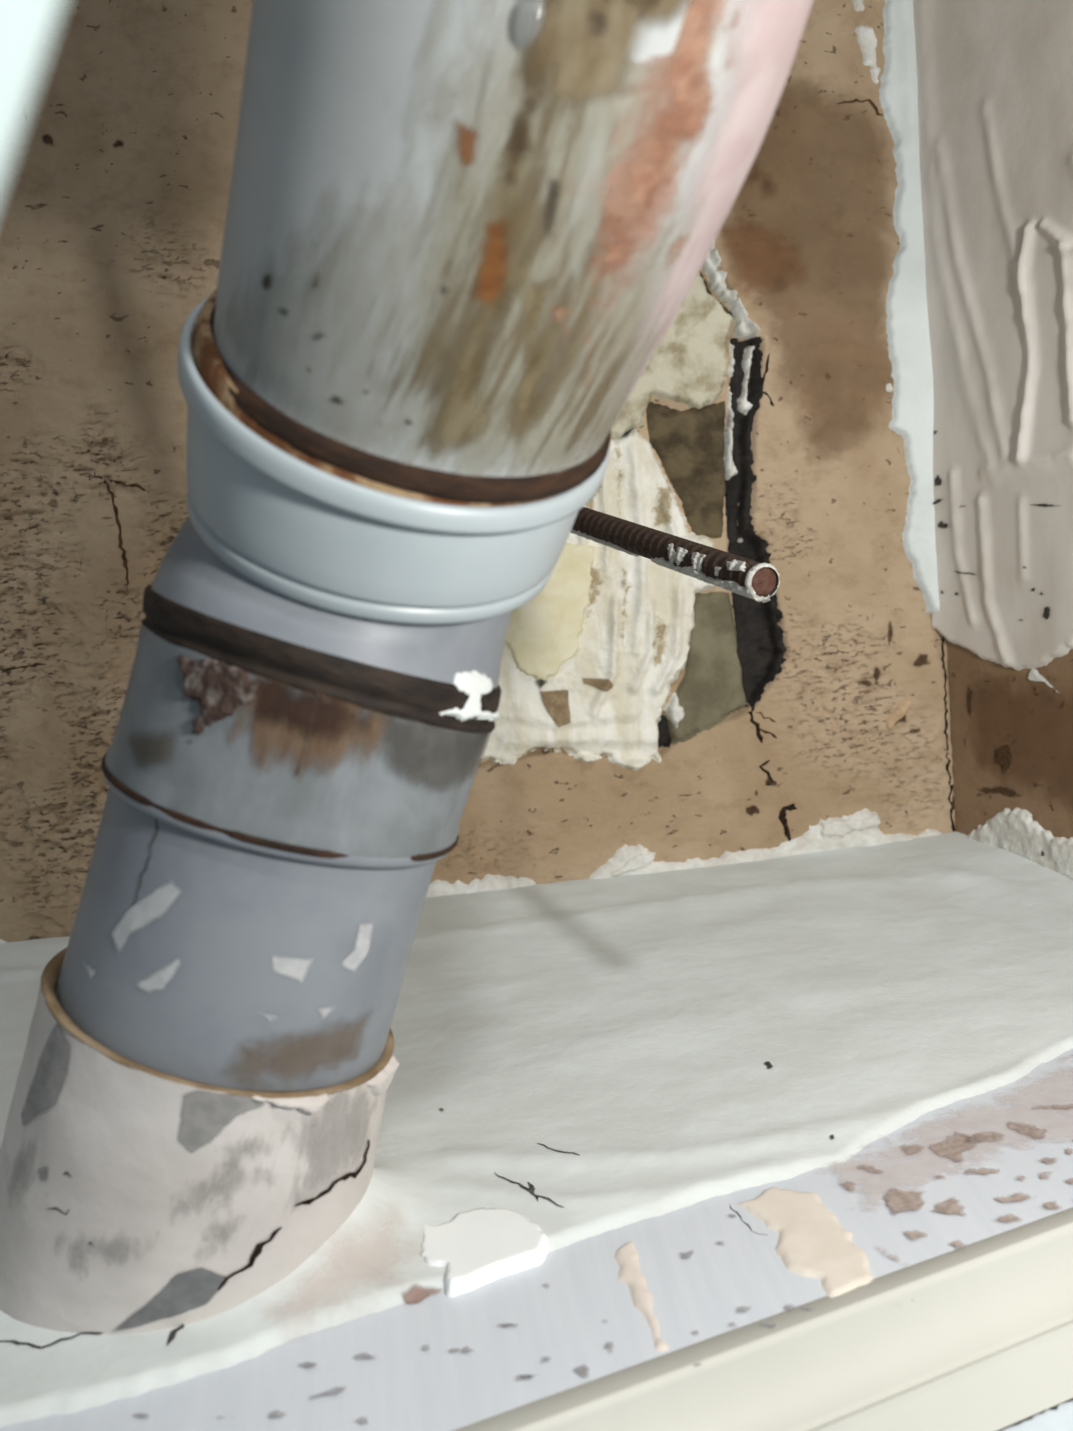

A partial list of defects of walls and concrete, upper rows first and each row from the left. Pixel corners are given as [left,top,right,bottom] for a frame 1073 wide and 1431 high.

flaking render [852,0,881,84]
rust [459,125,476,163]
rust [595,1,711,274]
spalling [584,241,771,564]
spalling [481,533,787,771]
rust [177,654,386,769]
crack [744,705,798,841]
crack [218,1139,370,1291]
flaking render [403,1208,548,1304]
crack [494,1172,564,1208]
peeling [901,1104,1073,1174]
crack [0,1332,102,1349]